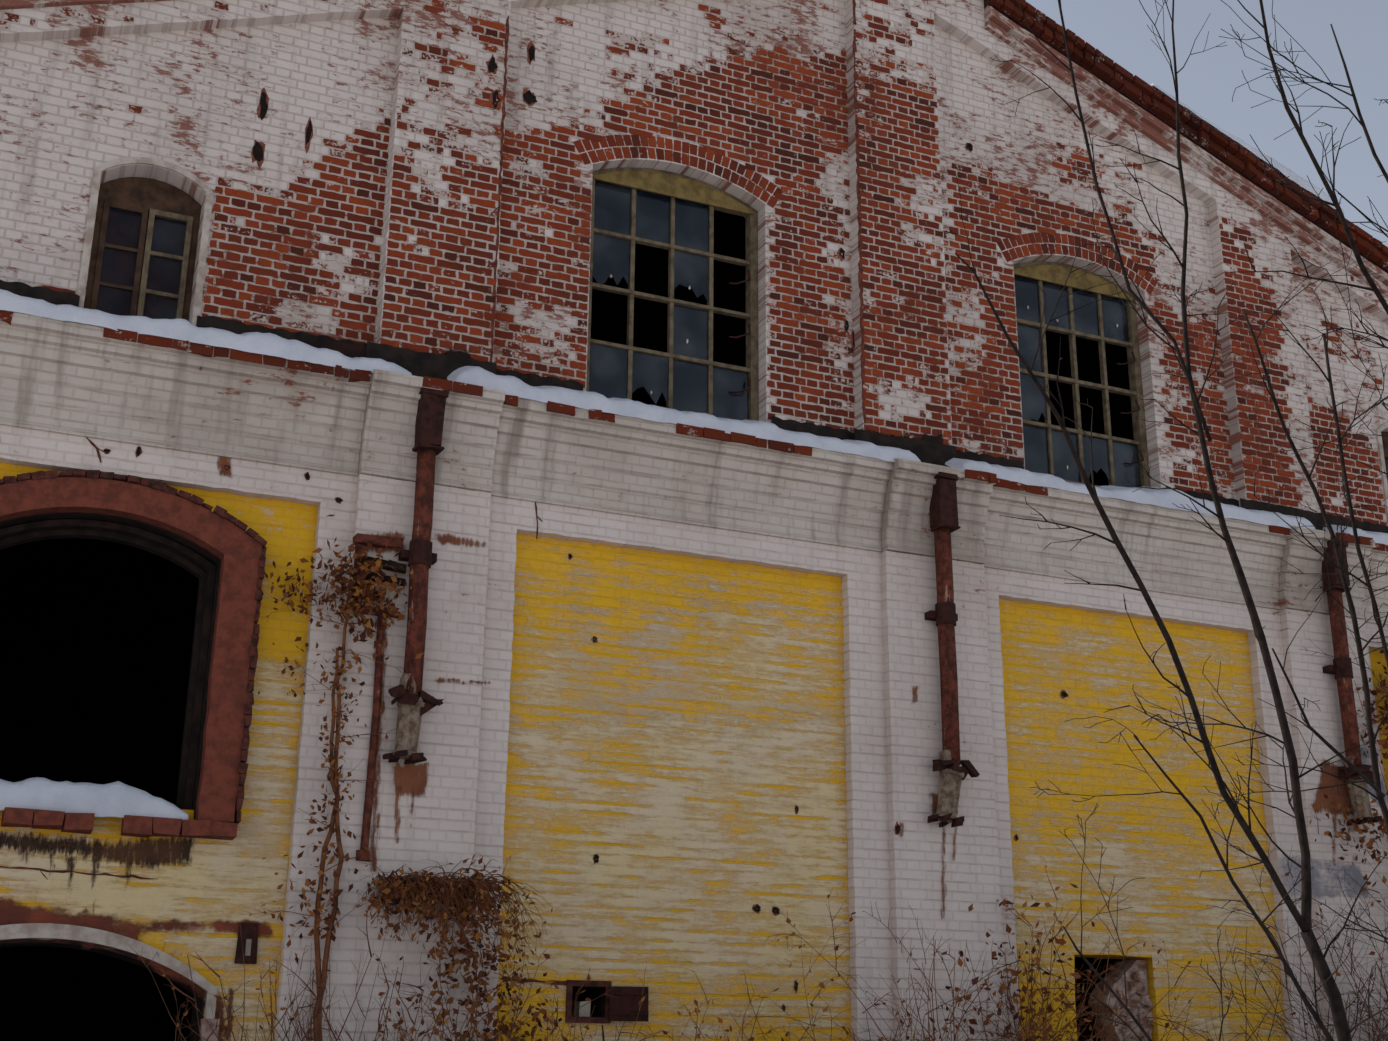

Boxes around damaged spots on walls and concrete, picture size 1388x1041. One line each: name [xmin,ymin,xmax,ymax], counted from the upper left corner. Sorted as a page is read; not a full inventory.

peeling [0,12,35,29]
peeling [57,7,134,25]
peeling [197,1,229,17]
peeling [202,0,1387,526]
corrosion [435,534,486,547]
corrosion [437,677,490,685]
corrosion [371,618,429,872]
corrosion [1313,760,1353,865]
leakage [0,832,193,886]